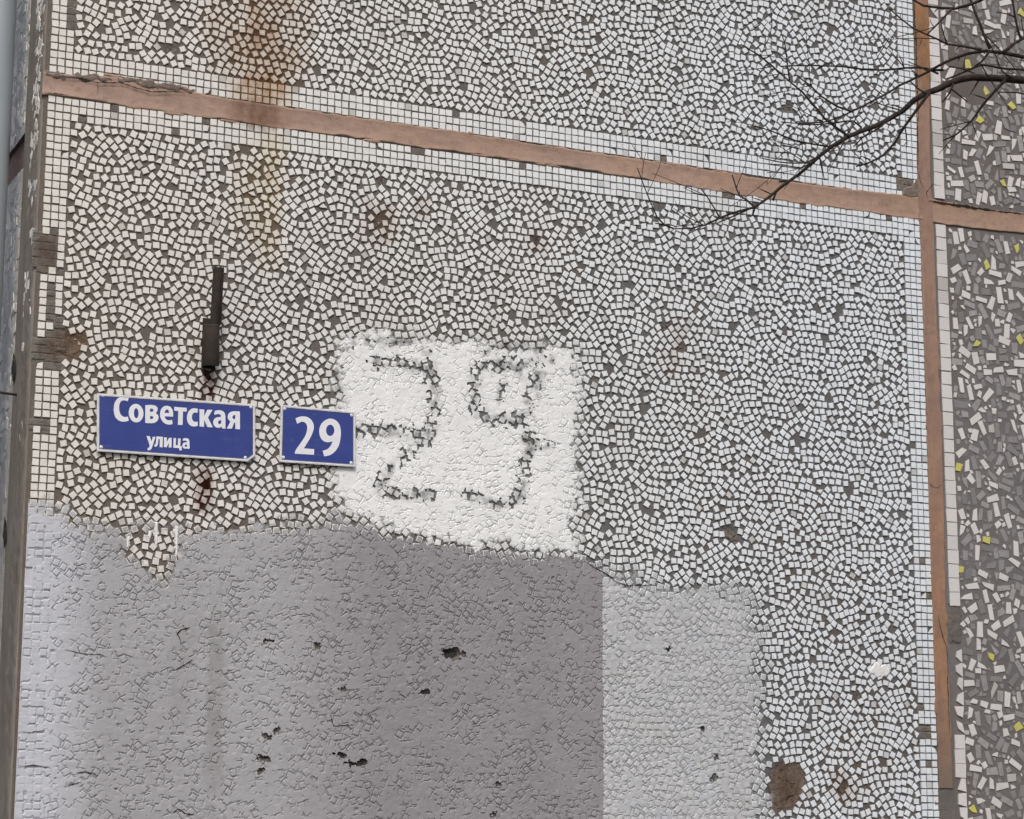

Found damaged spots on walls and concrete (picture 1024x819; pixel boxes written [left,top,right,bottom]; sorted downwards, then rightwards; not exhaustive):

spalling [51,332,89,358]
corrosion [198,470,210,511]
spalling [768,762,805,809]